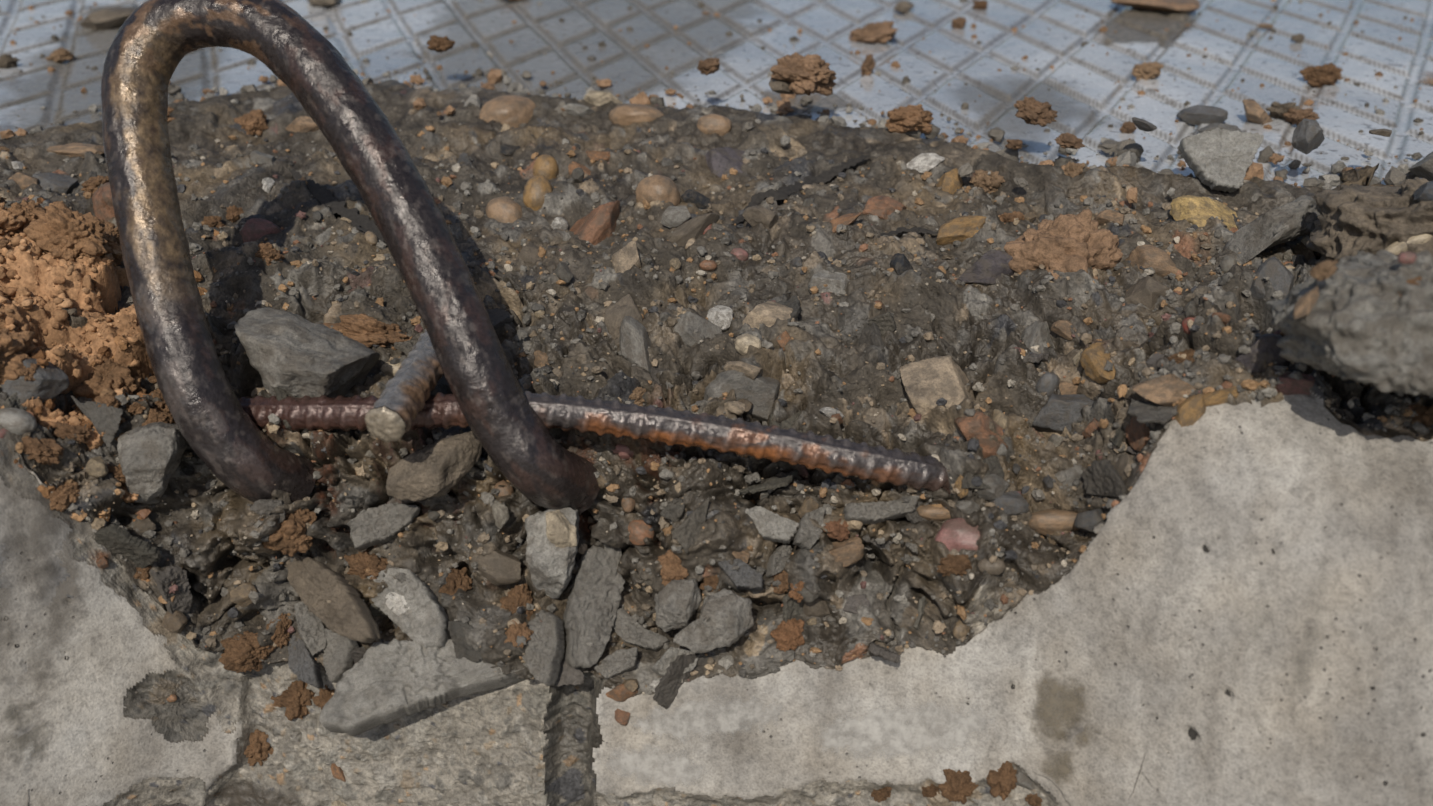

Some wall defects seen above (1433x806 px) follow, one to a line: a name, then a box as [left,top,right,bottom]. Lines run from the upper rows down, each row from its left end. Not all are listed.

spalling [1369,129,1392,137]
spalling [0,120,117,228]
spalling [1331,163,1405,190]
spalling [168,86,426,401]
spalling [62,308,90,329]
spalling [109,287,133,315]
spalling [1284,362,1433,442]
spalling [364,79,1325,806]
corrosion [579,511,593,533]
spalling [0,372,625,806]